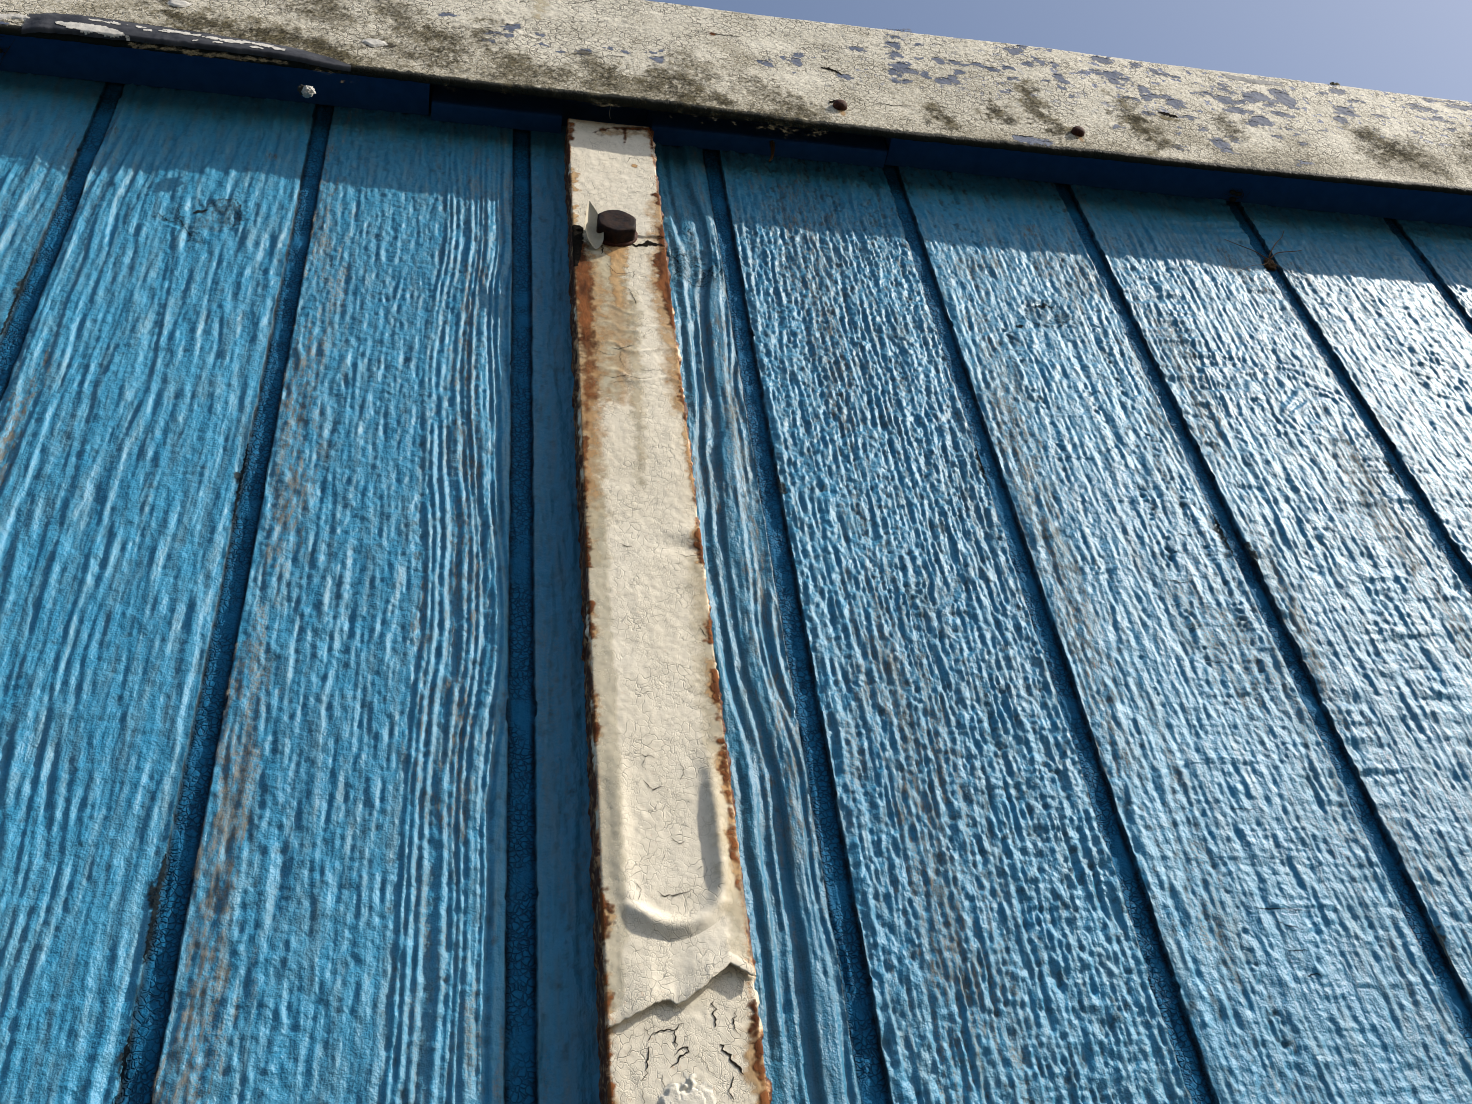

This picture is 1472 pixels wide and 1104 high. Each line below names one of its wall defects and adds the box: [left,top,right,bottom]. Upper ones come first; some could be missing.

water stain [136,0,744,121]
water stain [919,103,965,133]
water stain [977,79,1074,139]
water stain [1102,90,1180,160]
water stain [1345,126,1472,180]
corrosion [574,243,629,568]
corrosion [650,193,704,565]
corrosion [703,615,721,720]
corrosion [716,738,741,890]
corrosion [599,888,616,1061]
crack [642,1001,744,1103]
corrosion [744,999,770,1104]